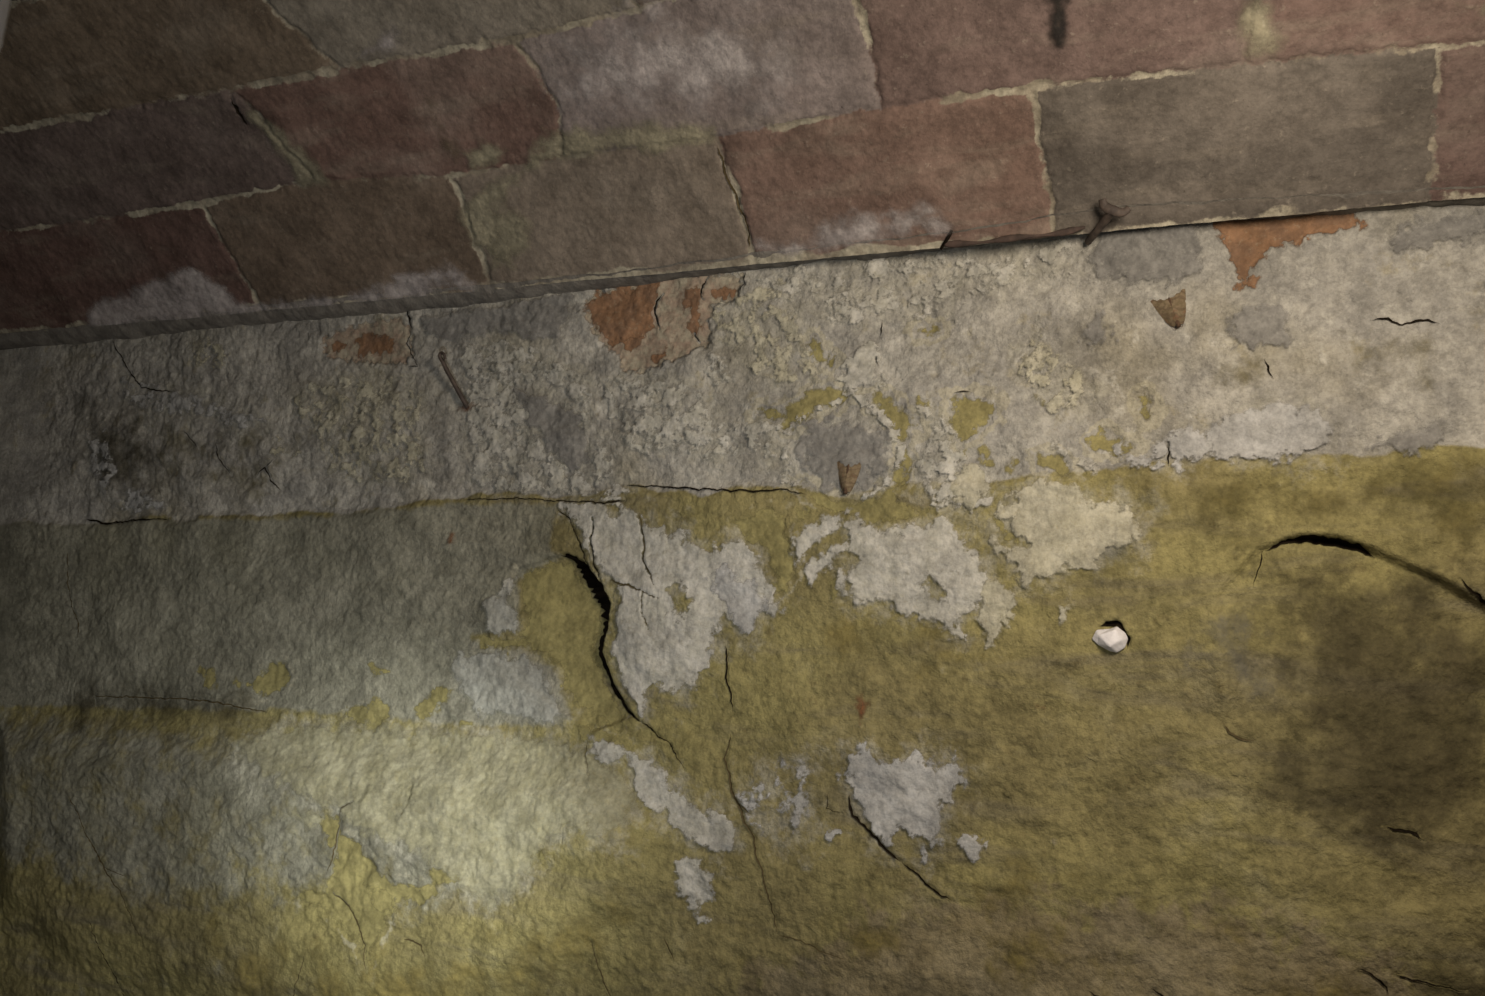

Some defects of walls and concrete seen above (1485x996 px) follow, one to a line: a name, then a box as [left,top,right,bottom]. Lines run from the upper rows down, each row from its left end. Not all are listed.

crack [467,485,803,768]
flaking render [239,239,1333,961]
crack [1254,535,1375,581]
crack [1462,580,1485,605]
crack [724,646,841,959]
crack [826,795,953,902]